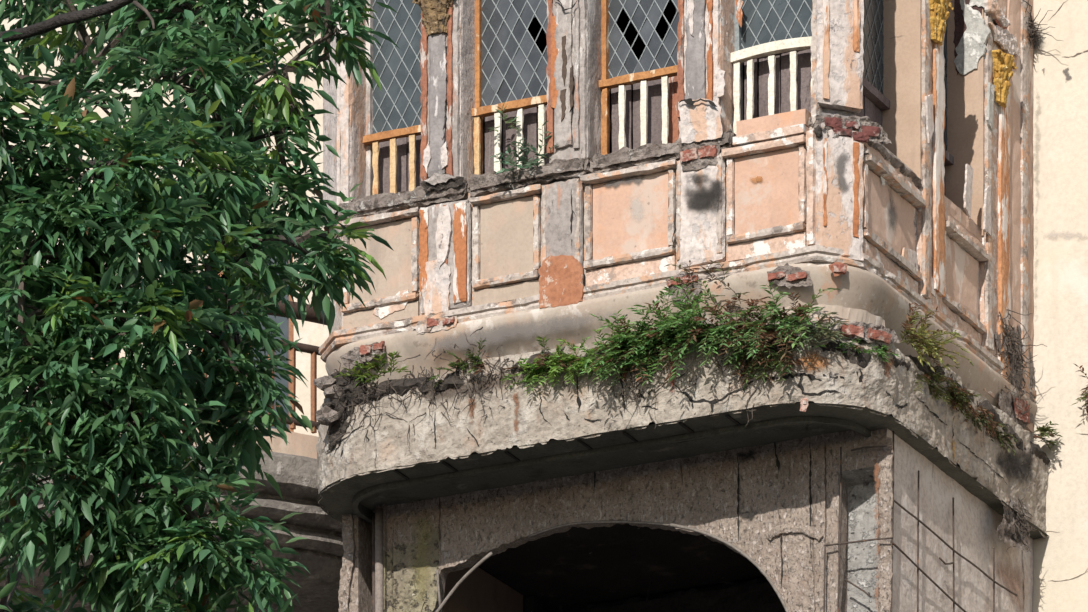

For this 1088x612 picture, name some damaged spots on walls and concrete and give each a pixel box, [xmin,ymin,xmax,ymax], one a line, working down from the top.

peeling [953,0,1020,76]
peeling [420,41,464,192]
spalling [813,114,892,144]
leakage [686,174,724,209]
peeling [373,204,457,334]
peeling [538,255,584,309]
spalling [838,321,901,347]
spalling [313,341,385,452]
crack [539,373,657,426]
crack [675,352,1007,484]